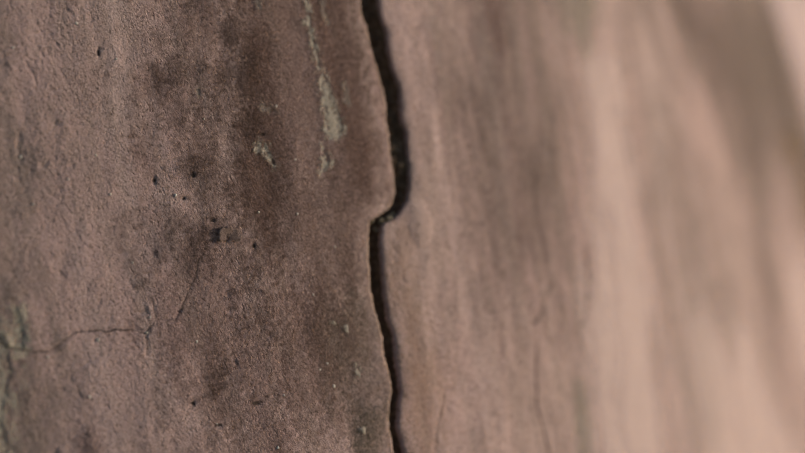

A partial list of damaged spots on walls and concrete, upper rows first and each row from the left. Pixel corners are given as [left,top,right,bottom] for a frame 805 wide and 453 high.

crack [0,247,205,353]
crack [360,0,408,453]